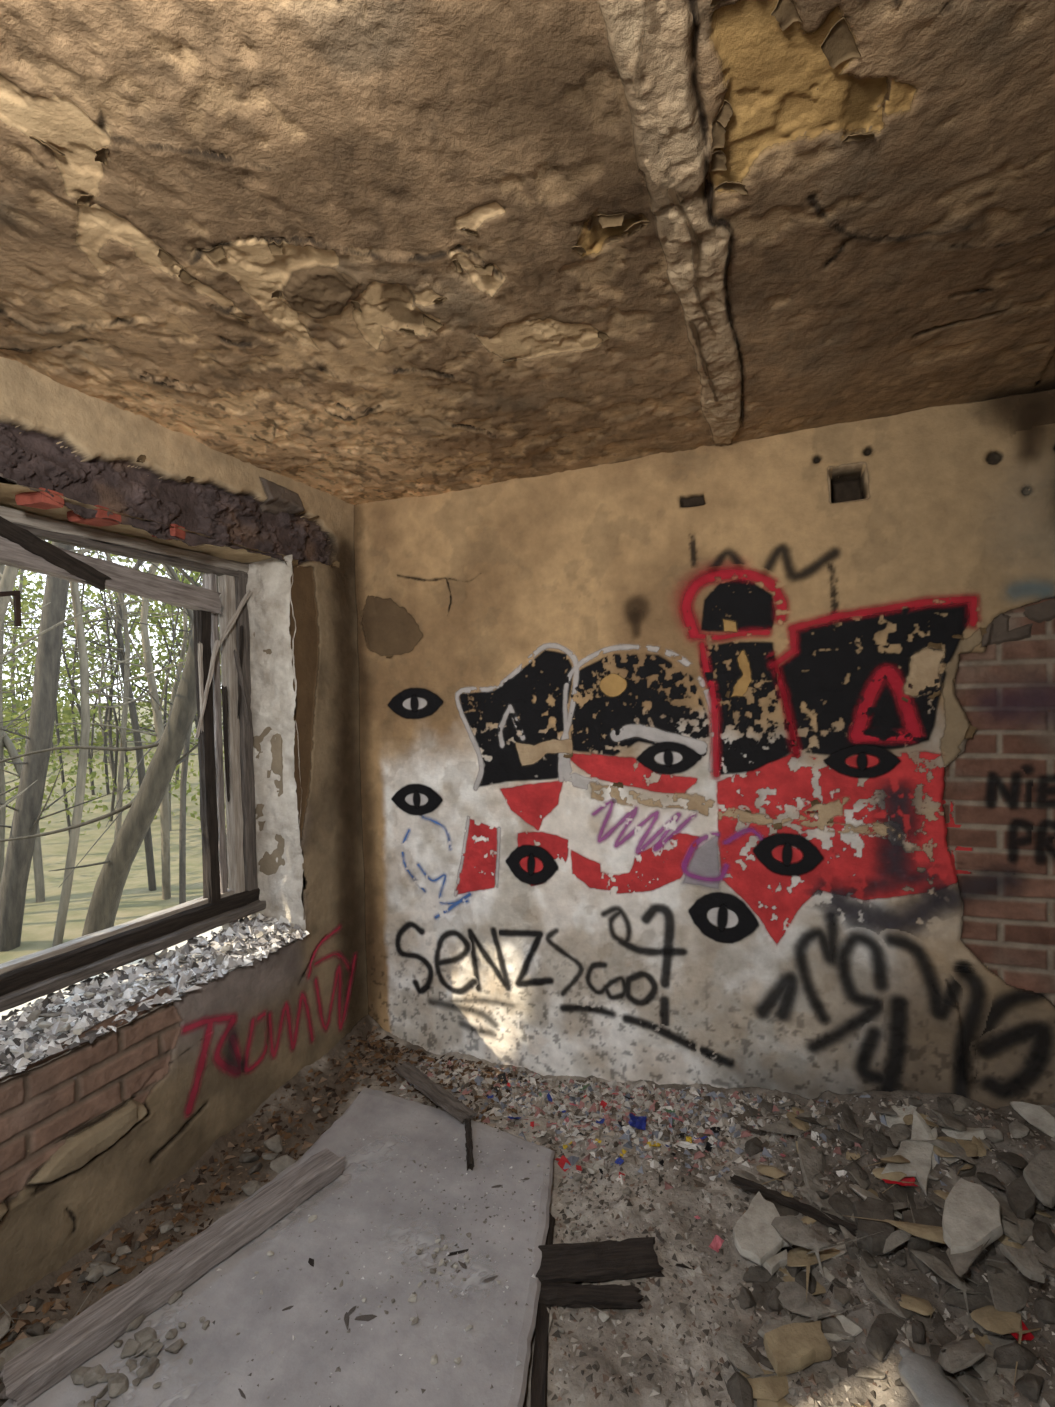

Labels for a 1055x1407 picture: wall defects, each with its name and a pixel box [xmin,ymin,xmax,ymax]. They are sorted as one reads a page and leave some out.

peeling [709,0,917,194]
peeling [0,75,339,351]
peeling [456,202,505,236]
peeling [571,212,650,257]
crack [688,0,744,421]
crack [807,195,1055,266]
peeling [450,250,505,297]
peeling [350,281,447,350]
peeling [476,318,609,363]
peeling [358,596,423,659]
flaking render [902,597,1055,1006]
flaking render [0,985,183,1222]